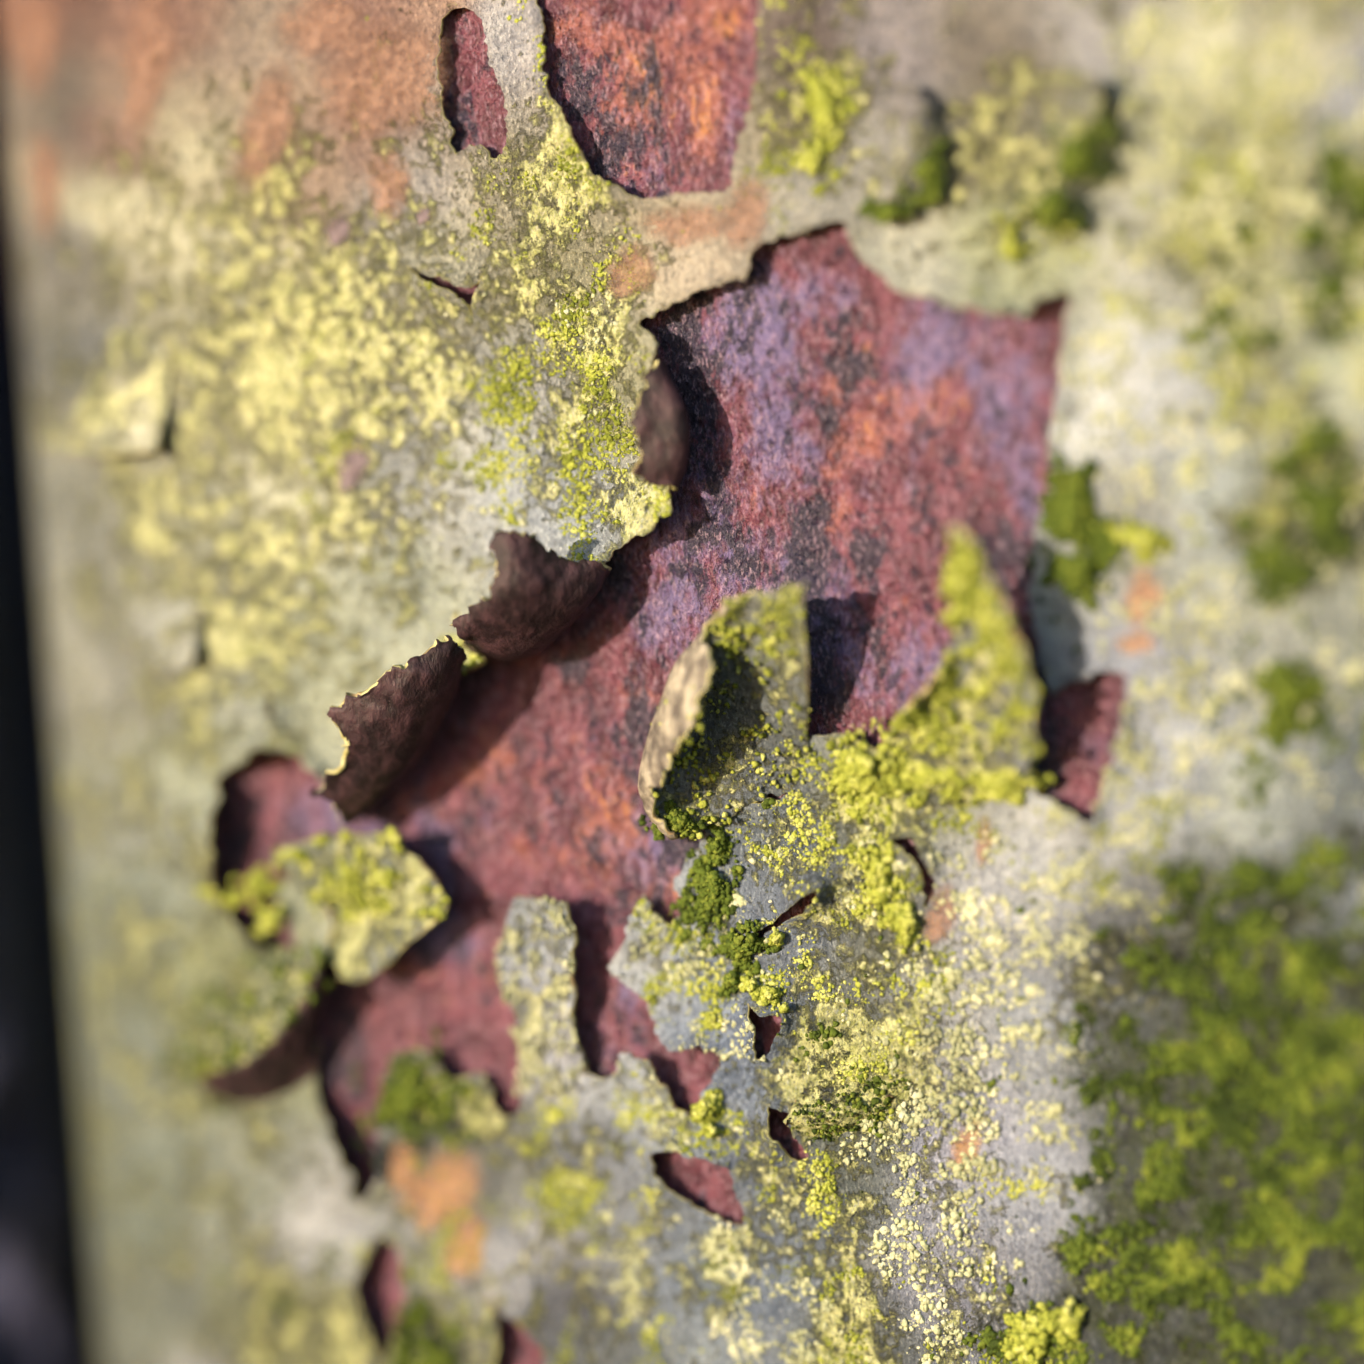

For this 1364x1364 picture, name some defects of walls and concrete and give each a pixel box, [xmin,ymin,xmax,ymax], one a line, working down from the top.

peeling [538,0,759,199]
corrosion [654,187,764,244]
corrosion [614,254,650,294]
peeling [150,66,1127,1202]
corrosion [927,898,952,939]
peeling [651,1151,744,1224]